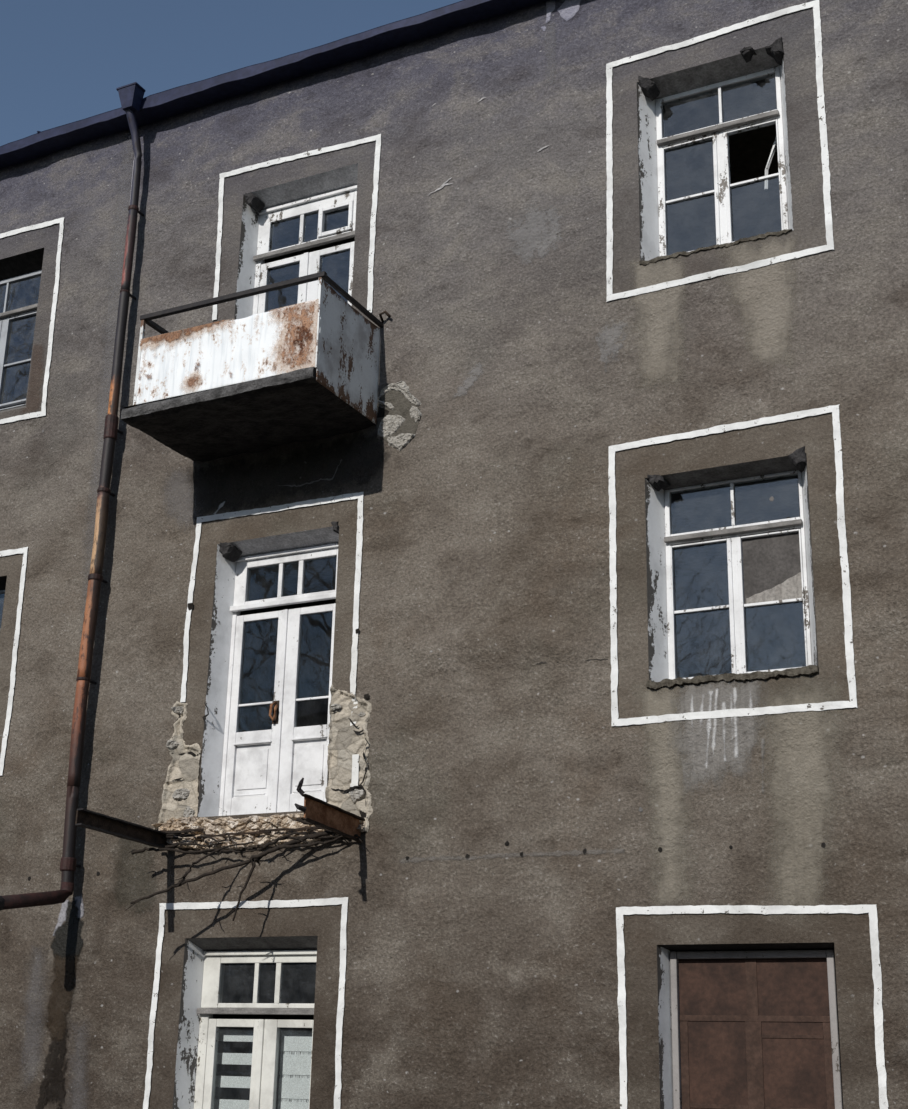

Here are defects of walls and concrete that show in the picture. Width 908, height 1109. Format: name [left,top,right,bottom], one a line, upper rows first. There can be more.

peeling [541,0,581,83]
corrosion [140,320,229,349]
corrosion [183,362,201,391]
corrosion [270,299,319,373]
flaking render [375,381,422,451]
flaking render [151,701,344,850]
flaking render [325,684,373,832]
leakage [640,680,838,906]
leakage [25,896,85,1109]